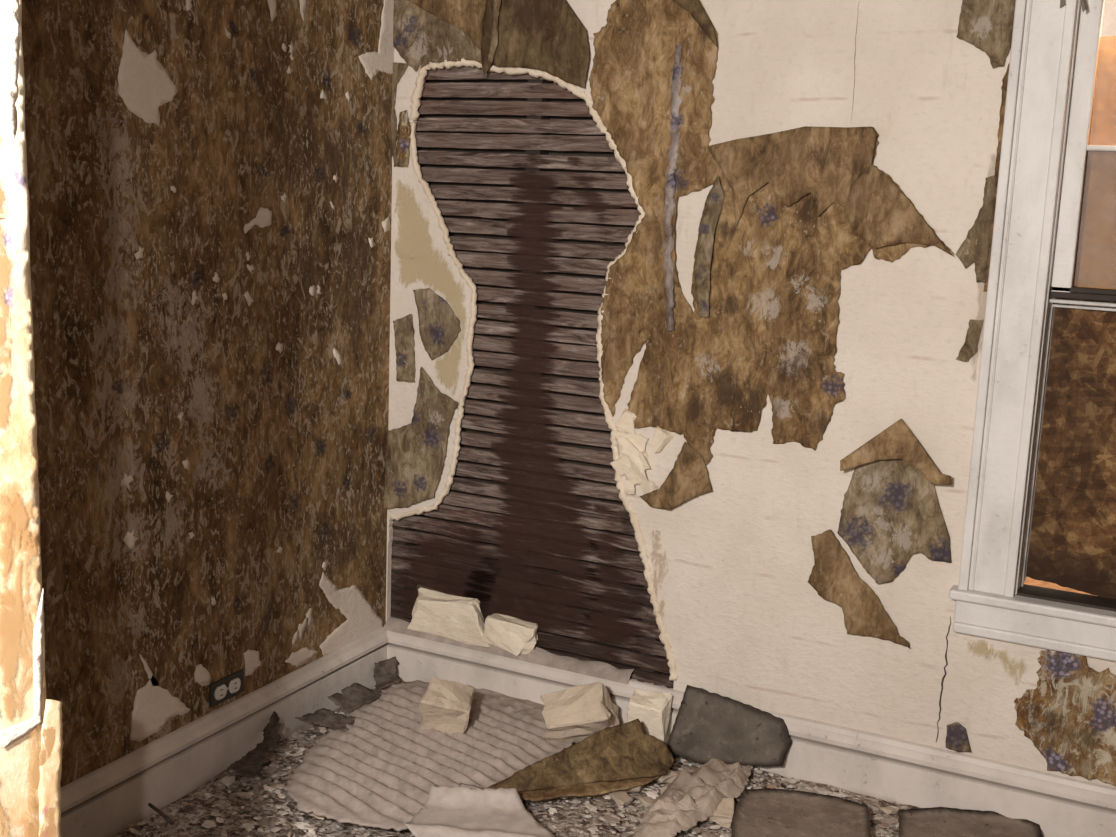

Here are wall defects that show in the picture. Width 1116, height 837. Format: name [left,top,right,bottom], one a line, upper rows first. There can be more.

flaking render [117,30,178,126]
flaking render [285,0,678,689]
water stain [393,154,643,658]
flaking render [129,655,190,742]
flaking render [194,664,211,686]
flaking render [244,650,261,676]
crack [936,617,951,742]